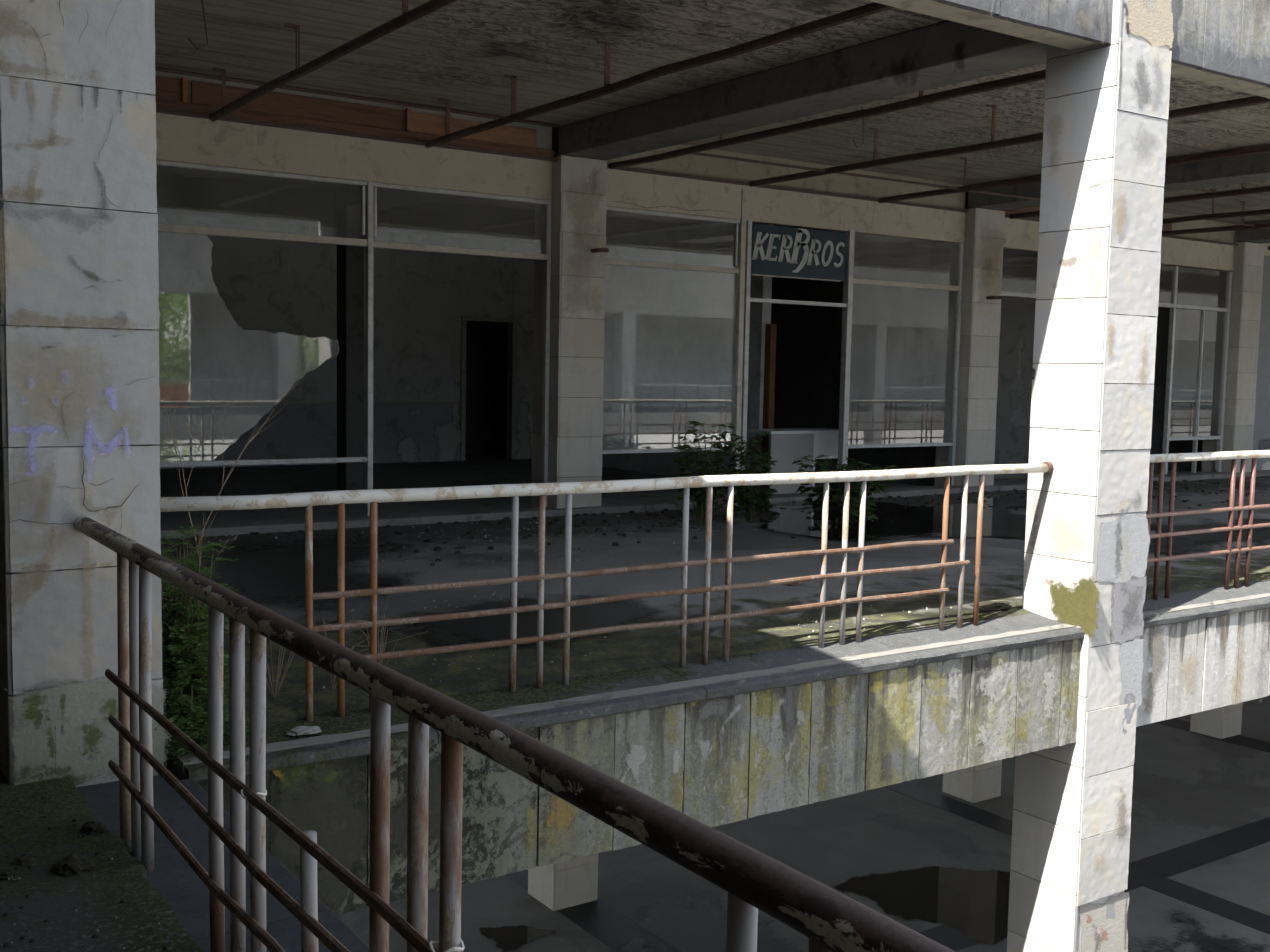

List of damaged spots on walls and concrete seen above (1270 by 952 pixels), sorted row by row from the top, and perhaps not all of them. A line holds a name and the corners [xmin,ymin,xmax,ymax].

crack [20,0,121,69]
spalling [1124,0,1174,48]
crack [96,108,118,209]
crack [8,392,140,553]
peeling [1097,514,1150,733]
leakage [1145,614,1165,711]
flaking render [5,677,119,785]
flaking render [152,688,169,776]
leakage [266,762,370,916]
leakage [390,791,408,865]
leakage [428,762,441,846]
peeling [1079,892,1129,952]